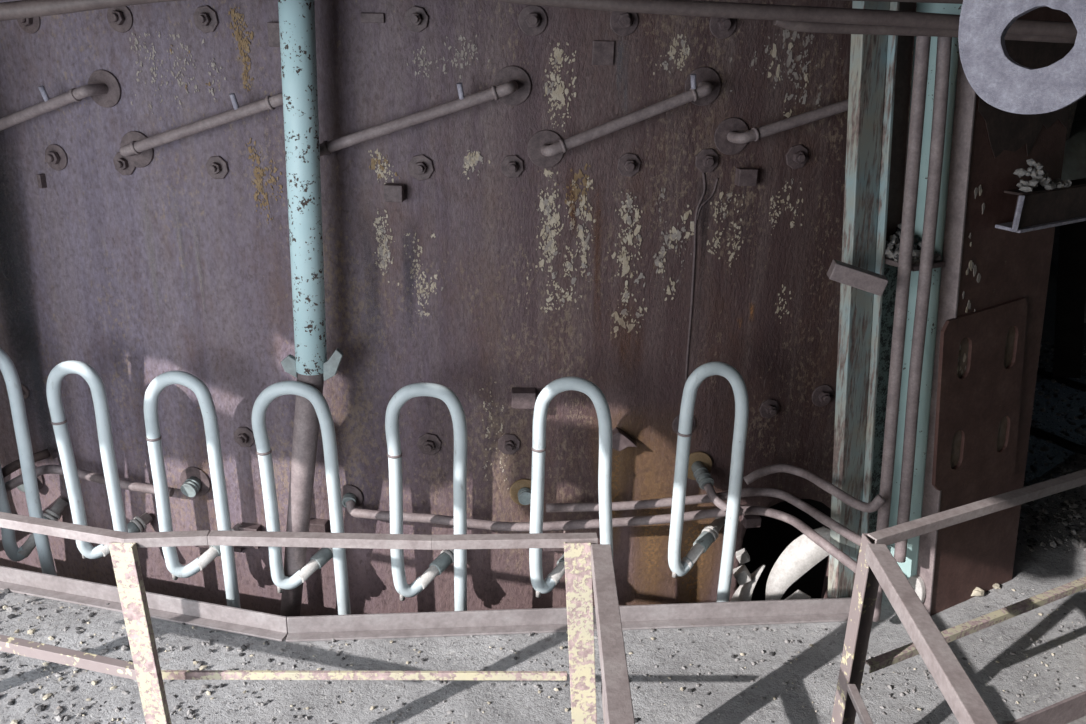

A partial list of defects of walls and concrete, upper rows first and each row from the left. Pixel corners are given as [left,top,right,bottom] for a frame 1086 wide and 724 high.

peeling [543,42,577,132]
peeling [653,34,690,75]
peeling [751,29,822,118]
peeling [368,148,400,184]
peeling [373,210,443,319]
peeling [526,163,596,313]
peeling [607,189,694,337]
peeling [707,191,744,268]
peeling [769,178,804,235]
corrosion [611,449,626,517]
corrosion [640,460,666,598]
corrosion [678,518,713,603]